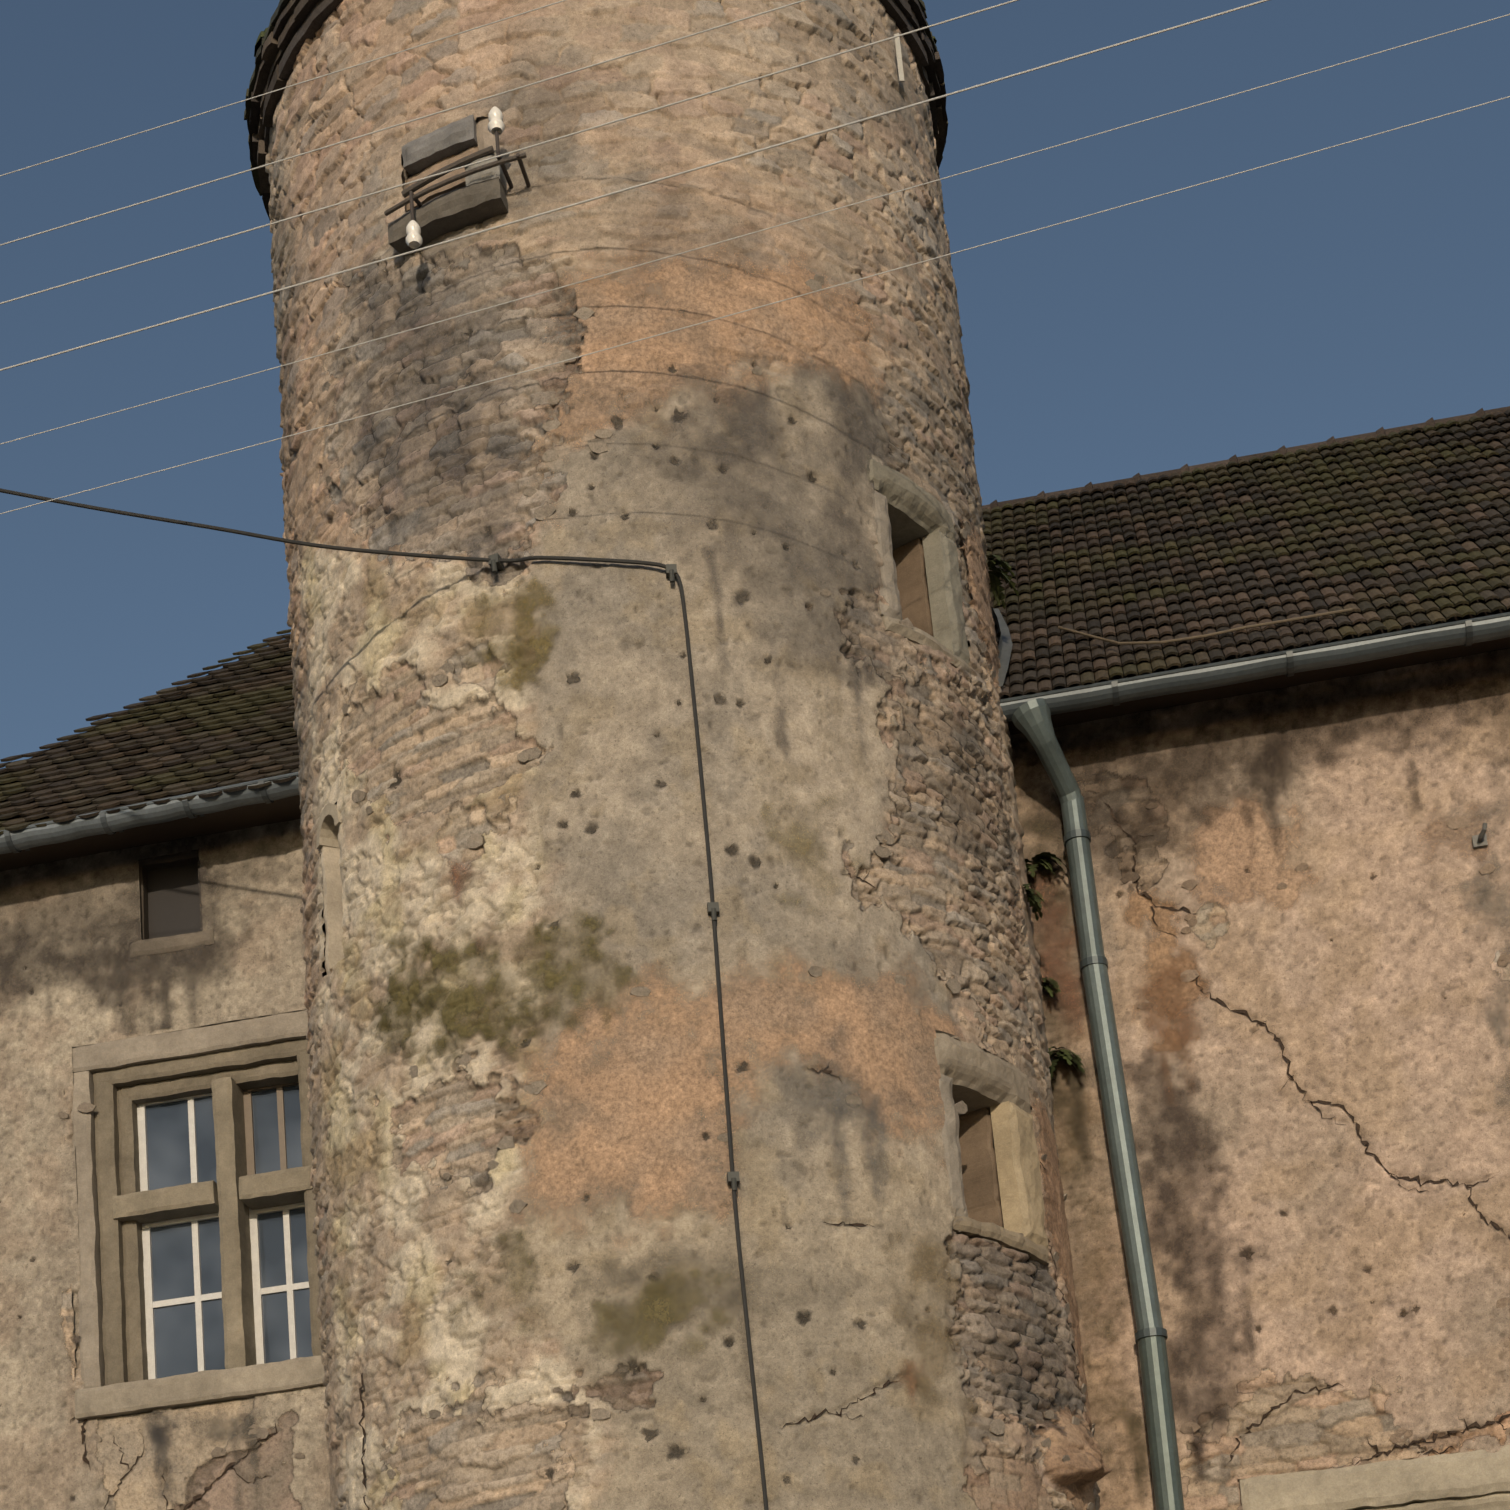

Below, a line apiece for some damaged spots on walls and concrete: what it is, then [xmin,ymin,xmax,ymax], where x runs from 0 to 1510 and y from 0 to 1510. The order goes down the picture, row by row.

spalling [319,243,888,596]
water stain [683,390,773,475]
peeling [374,517,1039,1221]
crack [1196,978,1510,1239]
spalling [937,1100,1095,1510]
water stain [1134,1058,1240,1419]
crack [70,1417,280,1510]
peeling [89,1397,305,1510]
crack [358,1373,369,1510]
crack [783,1376,905,1427]
water stain [1192,1433,1204,1473]
spalling [1179,1368,1510,1510]